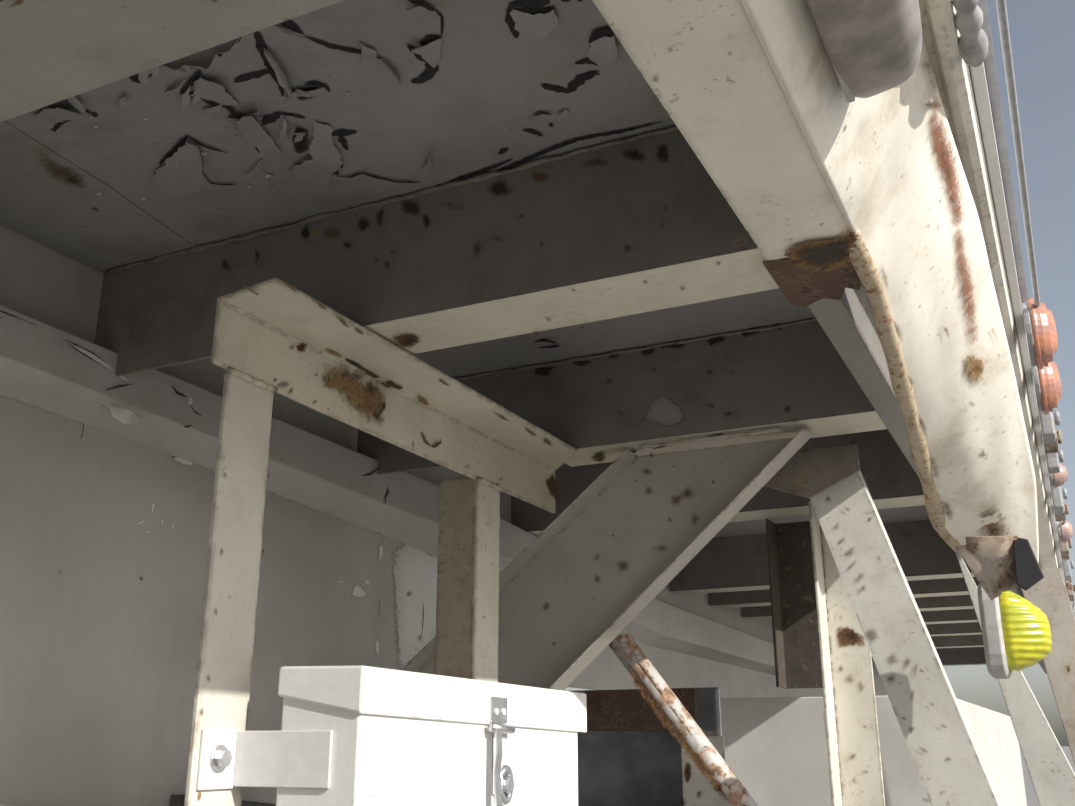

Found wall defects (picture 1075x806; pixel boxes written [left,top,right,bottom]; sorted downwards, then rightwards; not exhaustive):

peeling [505,0,583,39]
peeling [575,28,618,80]
peeling [33,96,99,132]
crack [262,112,305,125]
peeling [129,20,442,195]
crack [339,122,662,187]
corrosion [784,232,859,273]
corrosion [928,101,977,339]
corrosion [316,349,403,422]
peeling [379,544,438,670]
corrosion [837,627,874,646]
corrosion [629,662,726,800]